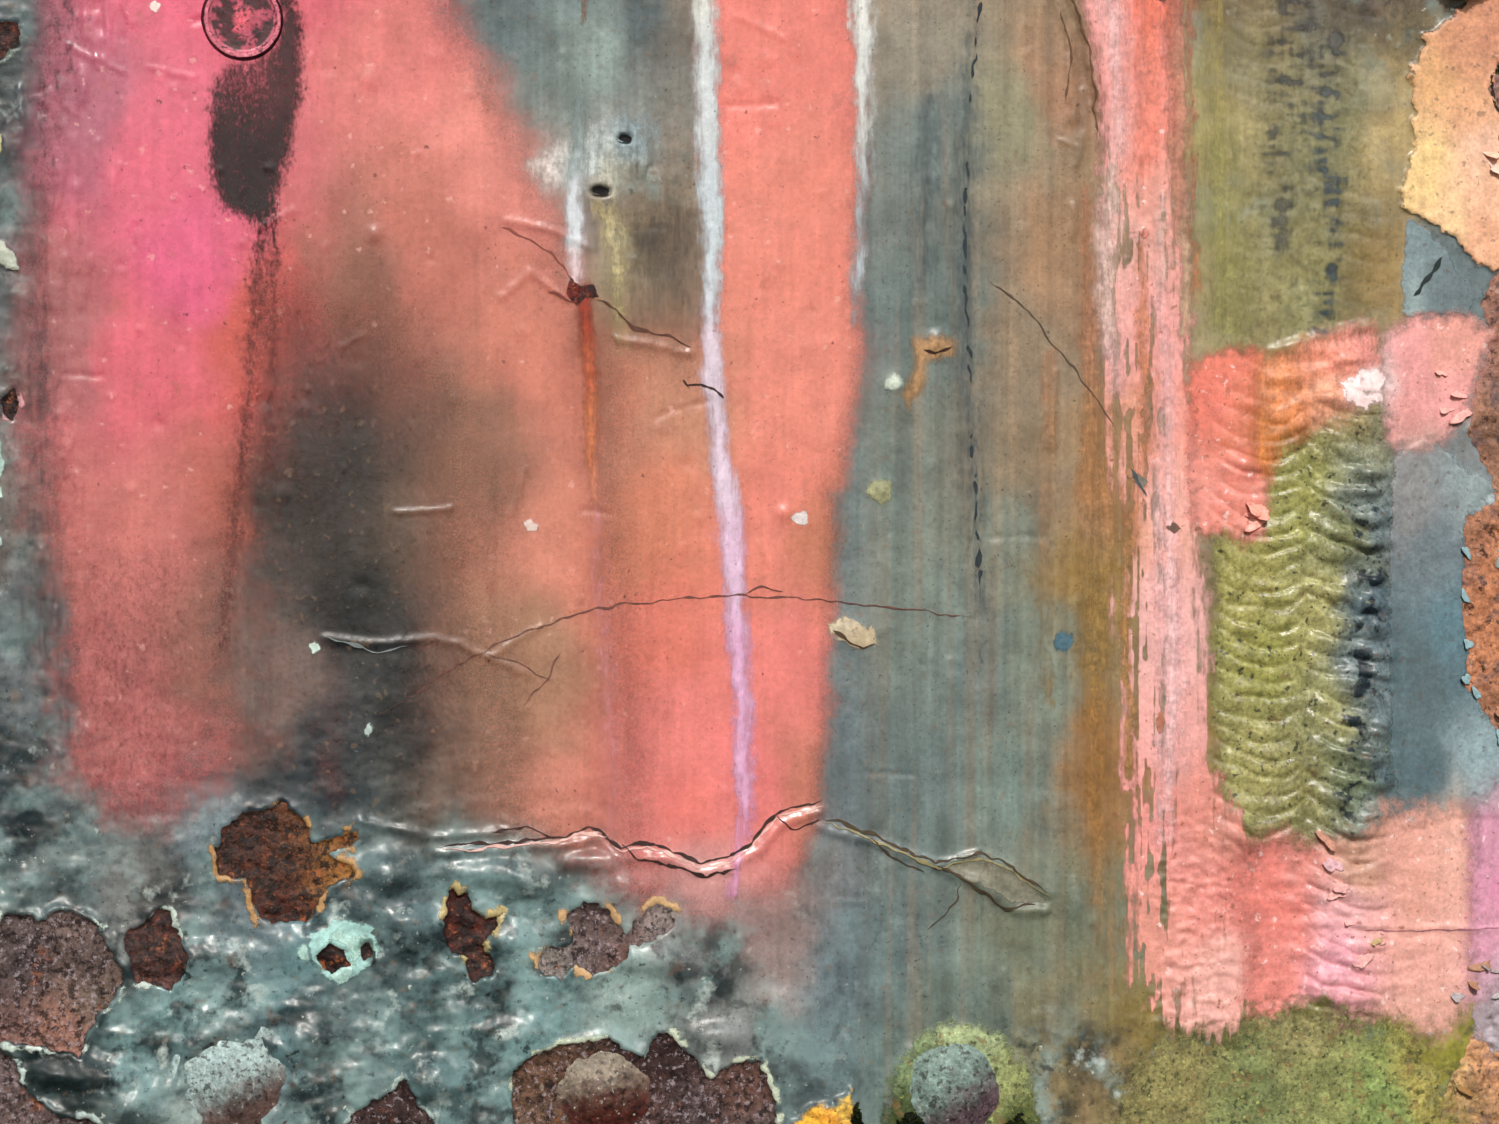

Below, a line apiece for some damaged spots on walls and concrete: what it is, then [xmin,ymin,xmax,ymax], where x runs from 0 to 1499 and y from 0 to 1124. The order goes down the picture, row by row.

crack [969,1,982,103]
peeling [0,241,19,270]
rust [567,278,598,501]
crack [383,141,1117,713]
crack [324,636,404,653]
peeling [308,918,378,980]
peeling [1451,960,1499,1054]
peeling [17,1055,119,1092]